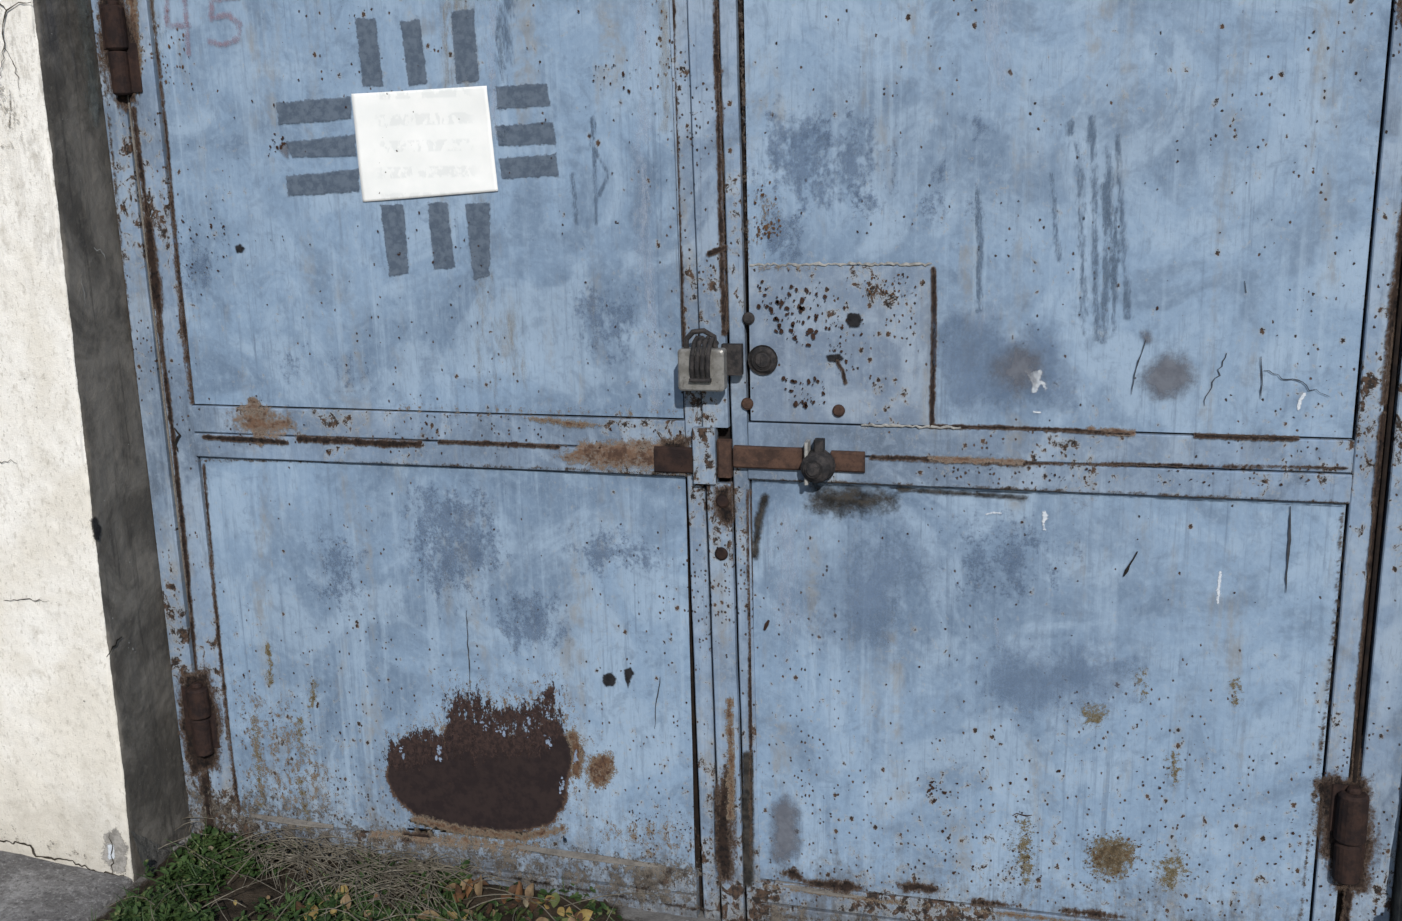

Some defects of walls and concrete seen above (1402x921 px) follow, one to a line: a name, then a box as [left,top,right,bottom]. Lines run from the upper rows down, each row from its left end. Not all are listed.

crack [0,2,31,87]
rust [666,0,701,347]
rust [706,0,729,336]
rust [739,0,864,374]
rust [95,0,695,834]
rust [782,376,825,409]
rust [333,478,1132,921]